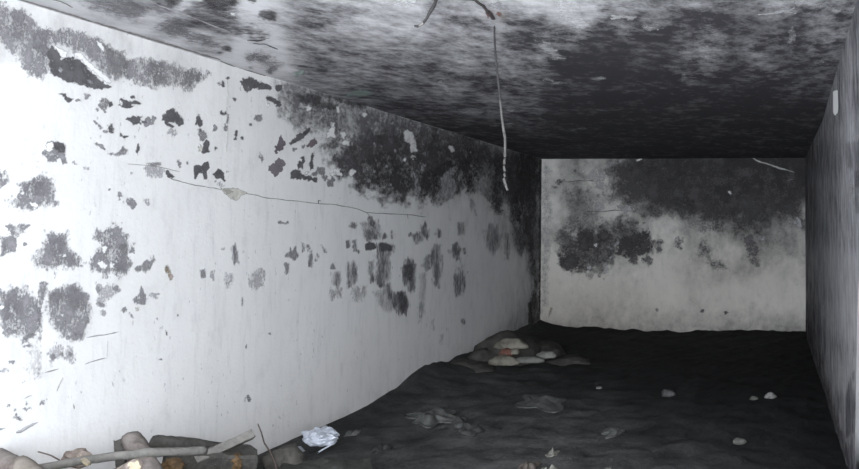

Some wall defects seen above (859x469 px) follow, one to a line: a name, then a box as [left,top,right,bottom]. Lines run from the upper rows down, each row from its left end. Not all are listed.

leakage [0,3,216,92]
leakage [87,0,152,18]
peeling [259,11,275,21]
peeling [46,45,184,155]
peeling [240,52,282,126]
leakage [296,94,350,110]
peeling [42,141,75,164]
peeling [145,110,247,201]
crack [132,164,425,220]
peeling [259,102,388,187]
leakage [558,189,653,271]
leakage [744,235,759,267]